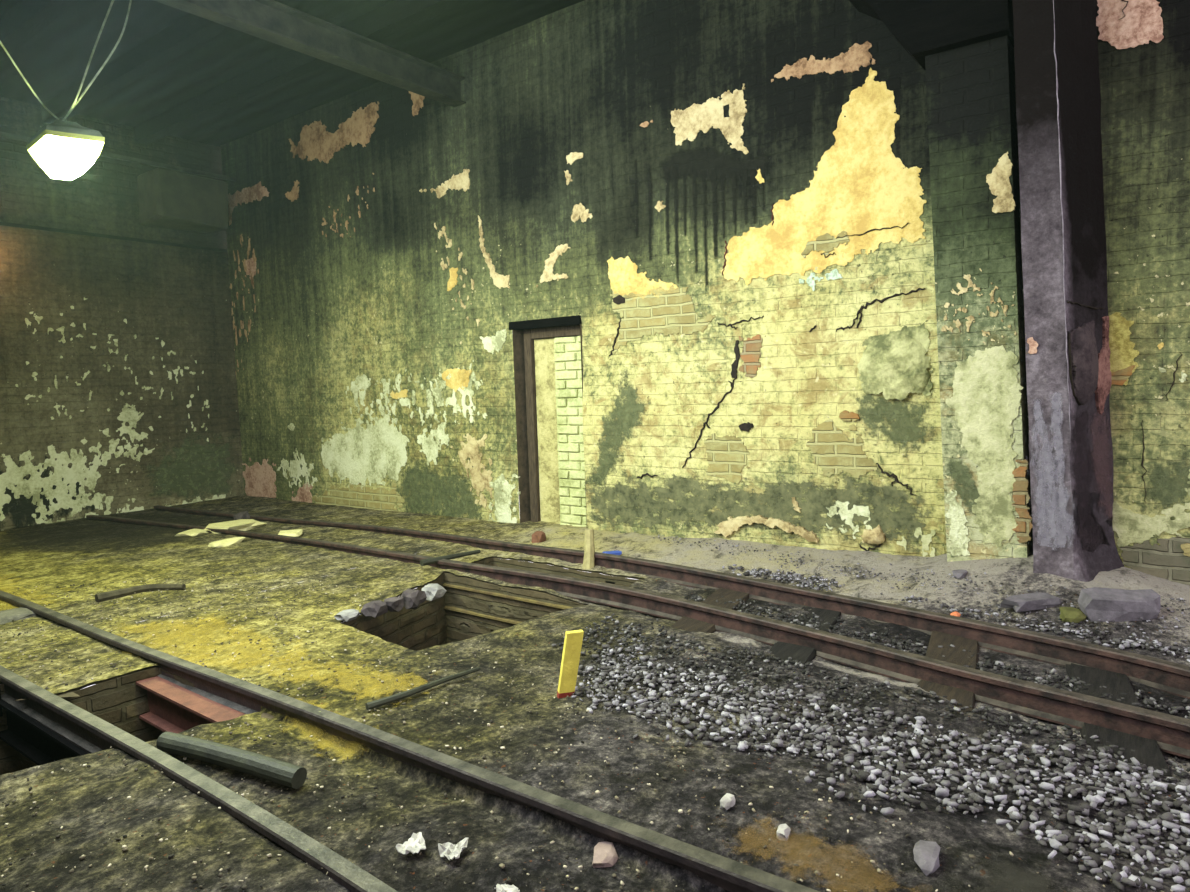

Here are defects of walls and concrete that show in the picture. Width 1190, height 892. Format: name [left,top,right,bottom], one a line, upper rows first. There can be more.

peeling [1096,0,1164,50]
peeling [288,101,380,164]
leakage [634,160,652,260]
peeling [671,84,749,155]
leakage [665,165,765,286]
peeling [721,41,926,285]
peeling [986,152,1016,213]
flaking render [607,256,716,356]
crack [809,288,925,332]
leakage [321,360,521,523]
crack [637,316,763,479]